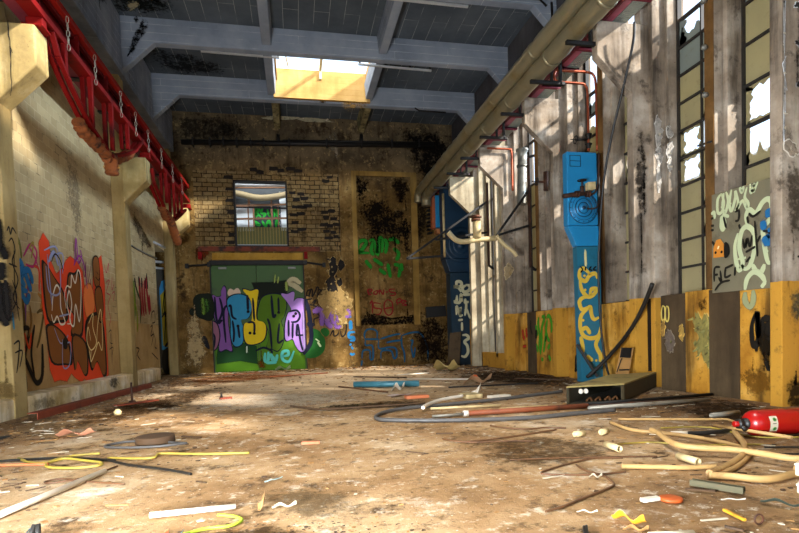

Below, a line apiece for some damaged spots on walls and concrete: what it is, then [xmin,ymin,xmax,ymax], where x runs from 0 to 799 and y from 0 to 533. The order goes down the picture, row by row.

leakage [114,0,173,56]
spalling [782,0,799,158]
flaking render [654,115,674,193]
leakage [356,177,428,255]
leakage [787,371,799,407]